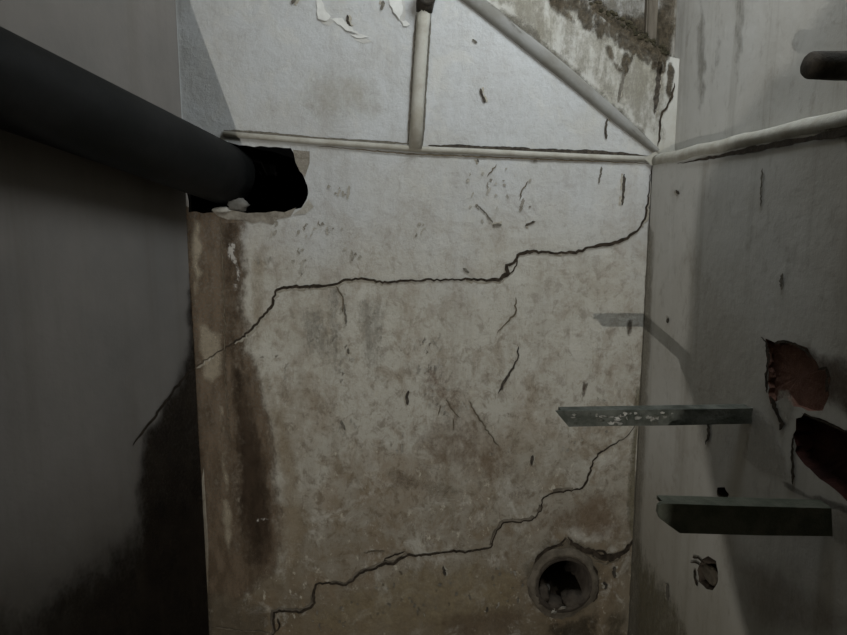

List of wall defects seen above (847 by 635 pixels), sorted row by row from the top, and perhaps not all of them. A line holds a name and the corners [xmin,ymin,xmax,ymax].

peeling [316,0,371,44]
peeling [379,0,410,26]
leakage [505,0,676,132]
spalling [187,143,313,225]
crack [133,172,652,447]
spalling [761,337,847,501]
crack [269,426,635,635]
spalling [691,556,718,590]